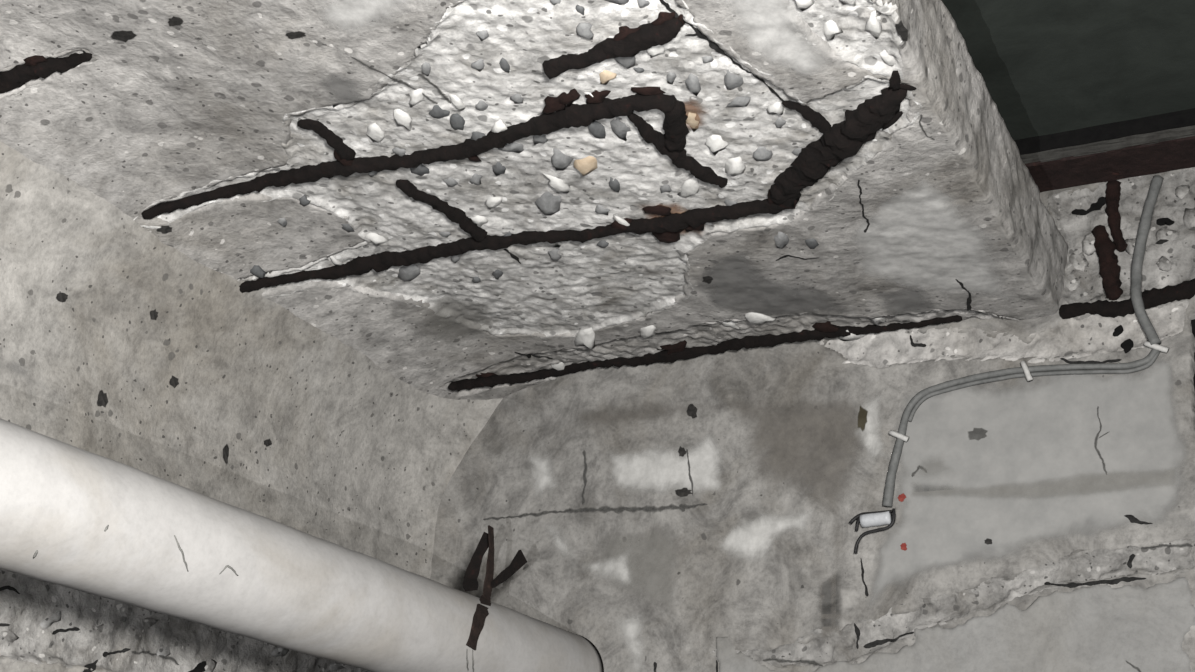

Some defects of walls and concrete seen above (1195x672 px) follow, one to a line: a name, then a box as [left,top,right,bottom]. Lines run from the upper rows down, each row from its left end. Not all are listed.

spalling [111,31,137,42]
rust [651,206,687,218]
spalling [134,0,1195,601]
crack [515,351,553,359]
crack [910,335,926,347]
crack [1060,325,1134,364]
crack [1187,319,1195,391]
crack [1095,407,1110,475]
crack [1044,515,1193,588]
spalling [0,569,370,672]
peeling [622,620,640,668]
flaking render [711,539,1195,672]